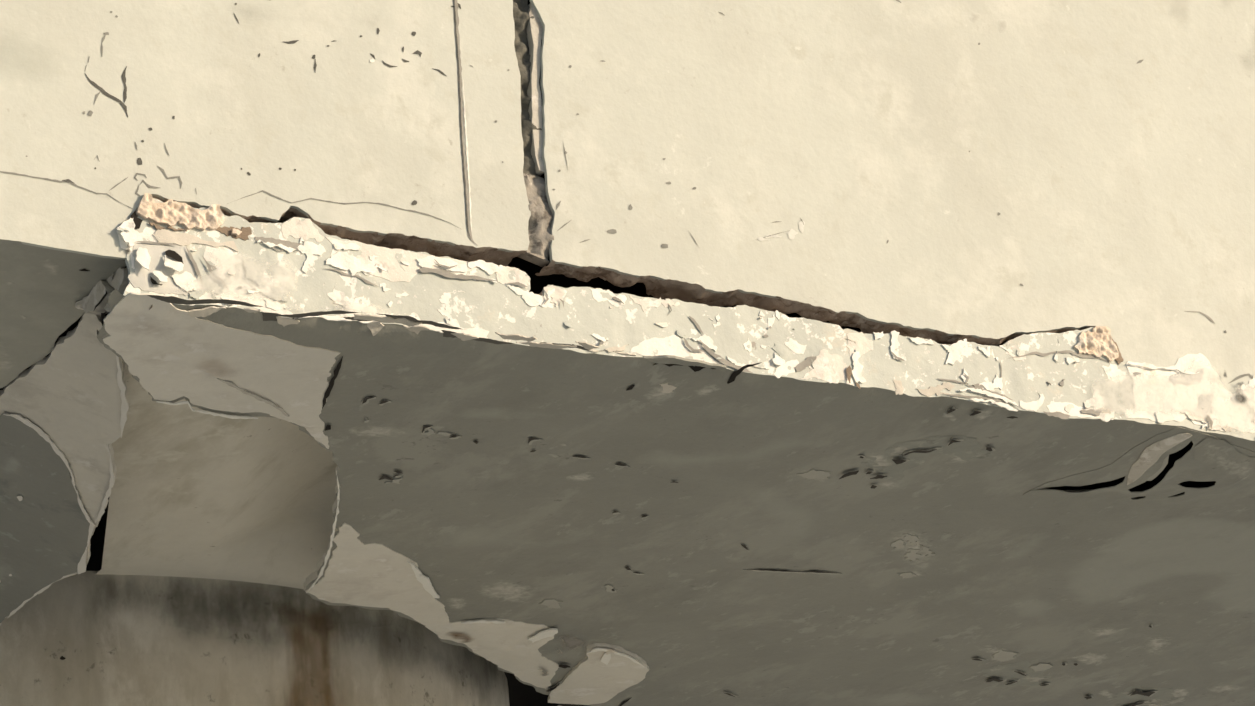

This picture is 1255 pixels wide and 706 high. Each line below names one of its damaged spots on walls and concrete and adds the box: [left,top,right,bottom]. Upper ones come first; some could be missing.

crack [0,0,1111,401]
crack [1184,311,1227,333]
peeling [743,310,1255,491]
crack [1229,374,1255,383]
flaking render [0,193,725,706]
crack [1165,441,1193,468]
spalling [970,624,1177,687]
spalling [1085,678,1251,706]